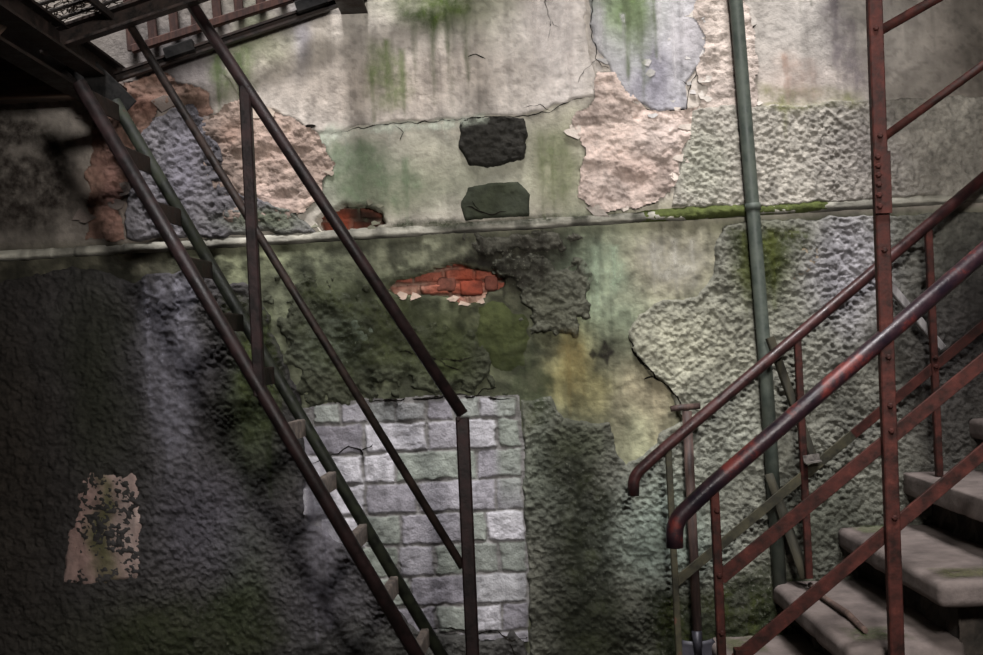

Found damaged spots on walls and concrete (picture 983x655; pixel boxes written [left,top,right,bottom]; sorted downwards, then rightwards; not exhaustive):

spalling [743,0,763,107]
flaking render [119,0,738,222]
spalling [72,110,135,242]
spalling [311,199,385,232]
spalling [389,264,505,306]